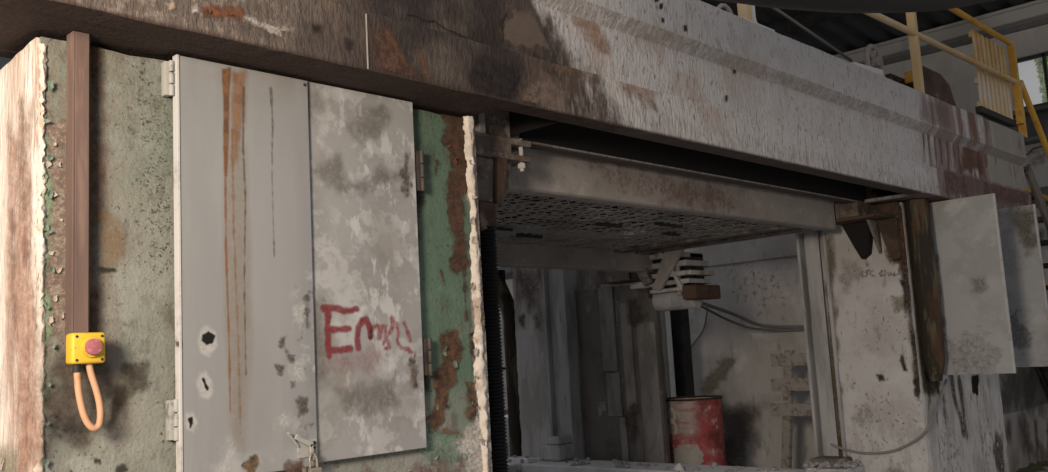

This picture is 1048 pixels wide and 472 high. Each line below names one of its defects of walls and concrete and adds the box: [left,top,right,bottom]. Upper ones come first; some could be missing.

rust [202,6,244,18]
rust [222,68,246,220]
rust [923,133,1028,204]
peeling [33,43,66,472]
rust [225,228,245,333]
spalling [409,116,493,472]
damp [1001,372,1048,453]